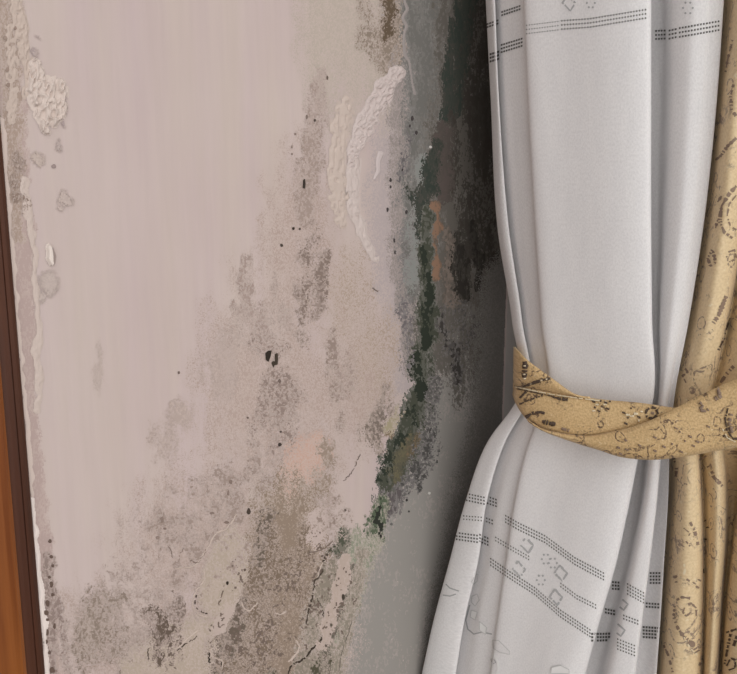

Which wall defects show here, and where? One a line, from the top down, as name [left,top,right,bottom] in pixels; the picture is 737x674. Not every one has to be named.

water stain [0,0,506,674]
crack [306,541,335,625]
crack [288,637,322,674]